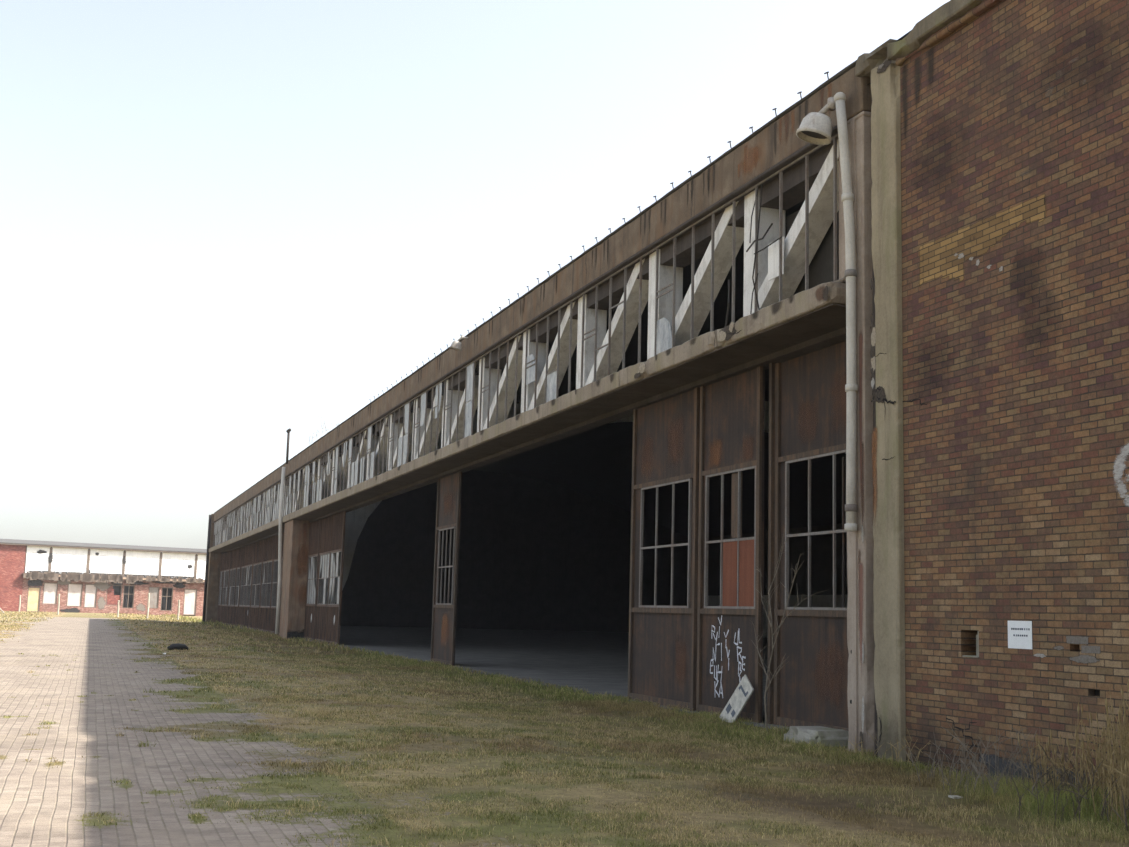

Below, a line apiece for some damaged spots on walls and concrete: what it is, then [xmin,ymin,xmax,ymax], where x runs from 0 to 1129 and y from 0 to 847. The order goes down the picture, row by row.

damp [902,48,934,133]
spalling [1034,636,1101,664]